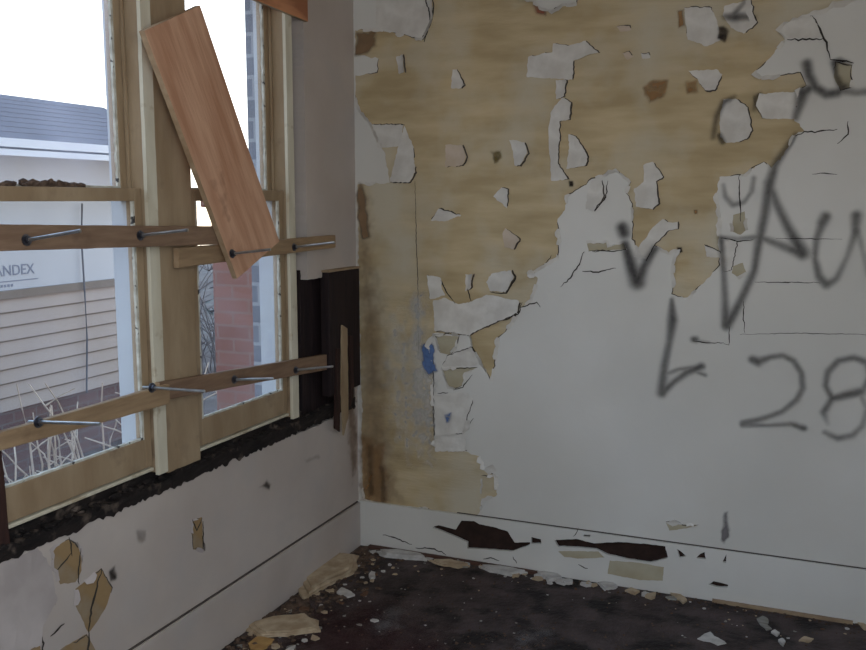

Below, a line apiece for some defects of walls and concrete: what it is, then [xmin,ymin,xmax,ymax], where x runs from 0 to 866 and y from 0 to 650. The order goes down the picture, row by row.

peeling [355,0,856,515]
peeling [190,517,205,553]
peeling [0,539,113,650]